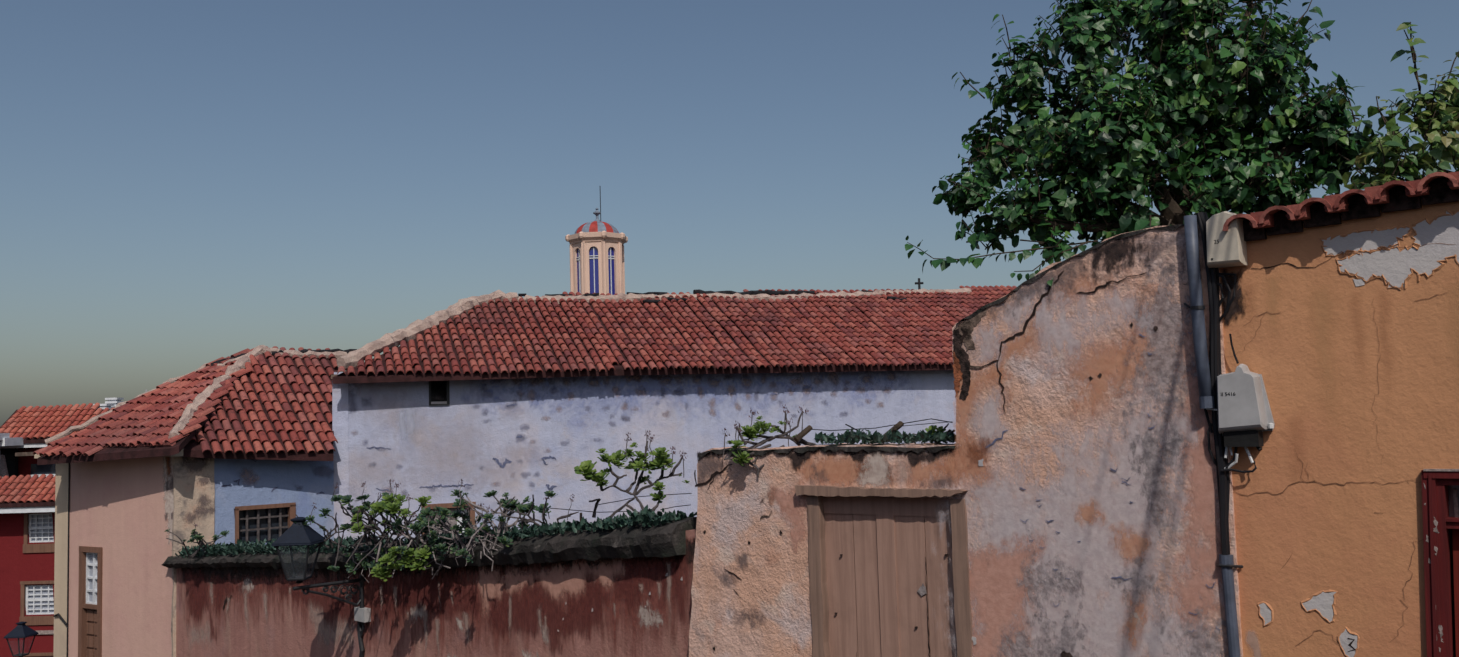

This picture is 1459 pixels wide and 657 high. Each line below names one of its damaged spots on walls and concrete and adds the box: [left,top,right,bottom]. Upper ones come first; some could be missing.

peeling [1320,209,1459,291]
crack [982,271,1147,448]
water stain [963,238,1226,657]
water stain [178,539,696,657]
peeling [1247,601,1274,657]
peeling [1300,589,1360,657]